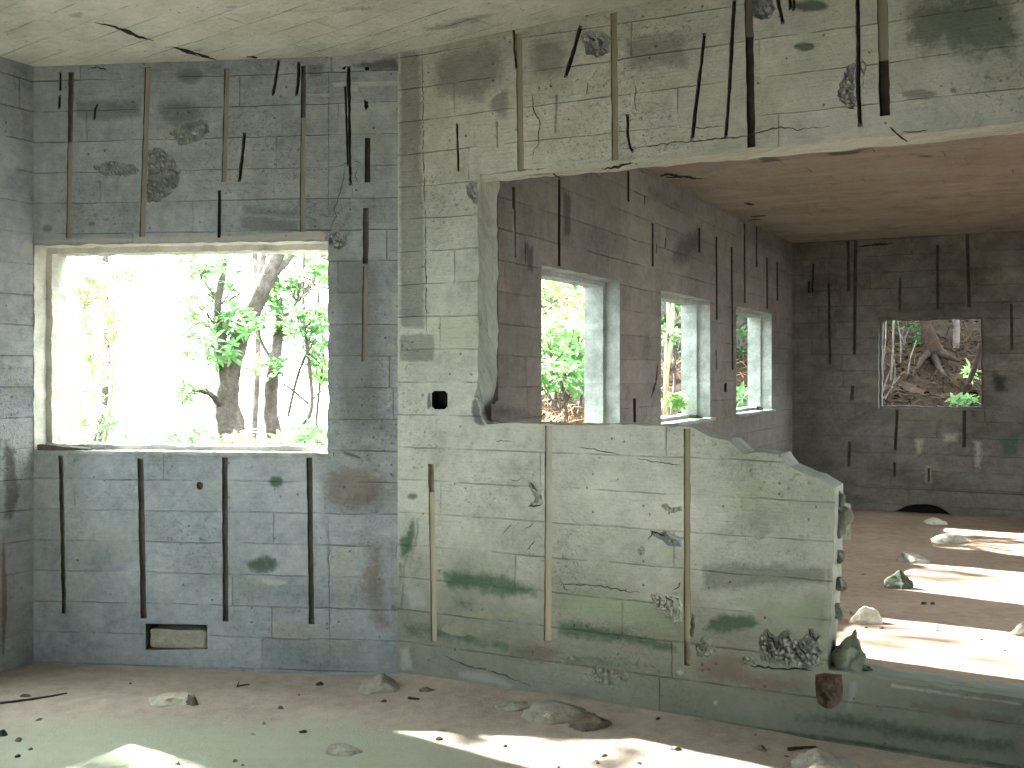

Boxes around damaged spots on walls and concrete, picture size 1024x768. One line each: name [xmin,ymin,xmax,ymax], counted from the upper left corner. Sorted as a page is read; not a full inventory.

crack [94,22,216,60]
spalling [564,25,612,78]
spalling [837,0,866,127]
water stain [900,87,958,101]
water stain [896,0,1024,80]
spalling [93,120,210,203]
crack [602,126,829,170]
crack [890,127,926,142]
water stain [305,35,513,614]
crack [560,579,637,593]
spalling [650,592,717,658]
spalling [758,628,843,709]